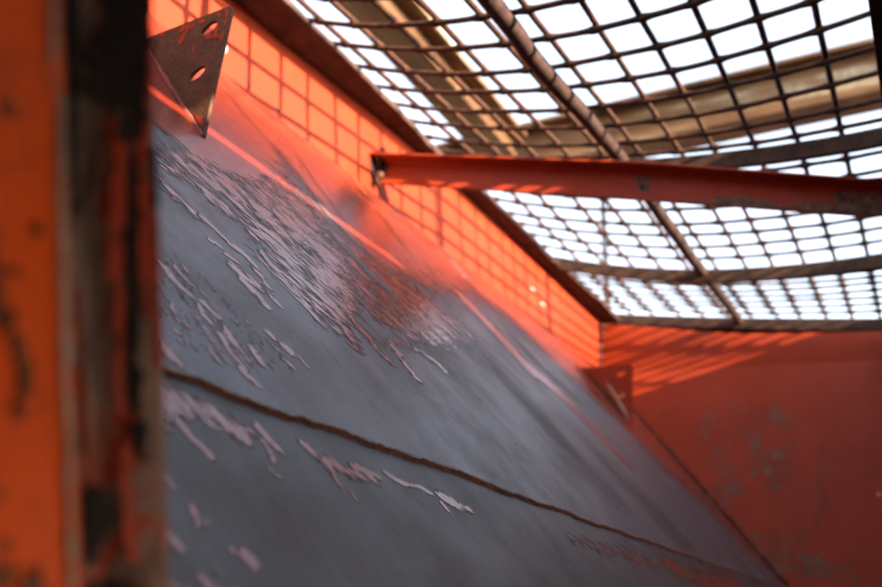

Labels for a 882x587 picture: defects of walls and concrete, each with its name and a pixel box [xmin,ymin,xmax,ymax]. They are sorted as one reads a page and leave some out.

peeling [106,15,636,480]
peeling [118,443,141,566]
peeling [228,547,261,576]
peeling [296,438,474,515]